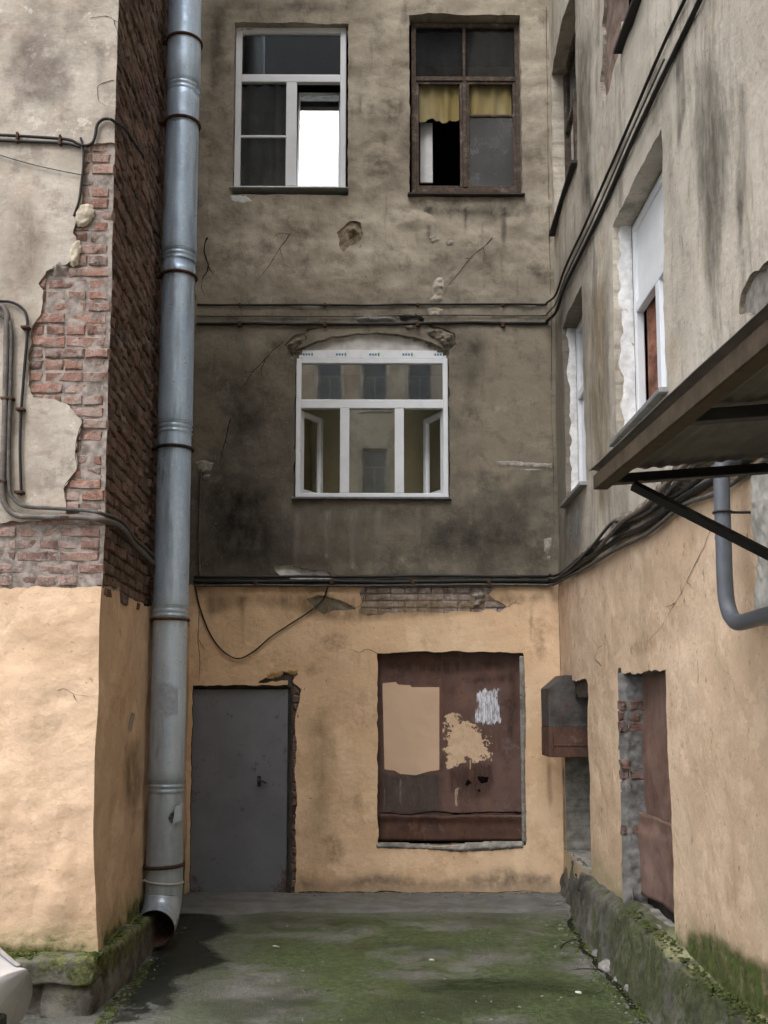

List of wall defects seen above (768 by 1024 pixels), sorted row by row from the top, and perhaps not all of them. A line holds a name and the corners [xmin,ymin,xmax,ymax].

flaking render [0,143,117,589]
crack [201,237,213,293]
flaking render [337,222,363,251]
flaking render [307,586,507,616]
flaking render [249,672,305,893]
flaking render [617,673,648,903]